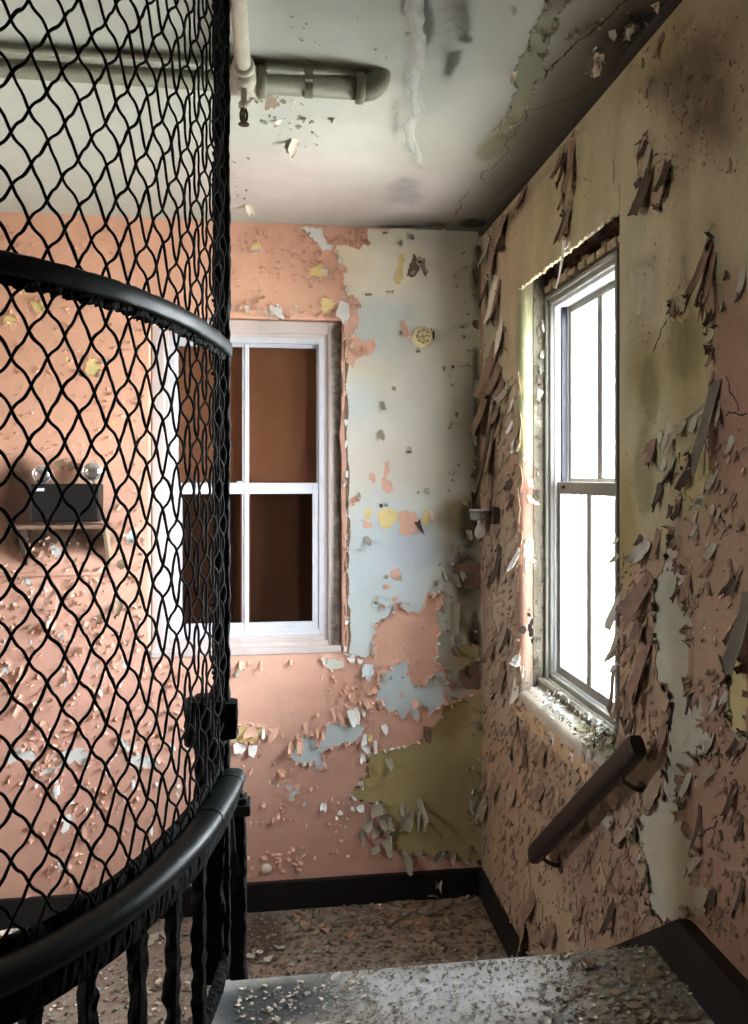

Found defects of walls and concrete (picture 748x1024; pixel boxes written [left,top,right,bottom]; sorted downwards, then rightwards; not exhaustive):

peeling [247,95,319,159]
crack [455,93,580,217]
peeling [494,0,648,136]
crack [544,0,627,78]
spalling [516,16,744,294]
peeling [0,286,144,471]
crack [725,376,747,416]
peeling [229,162,748,954]
peeling [0,503,196,890]